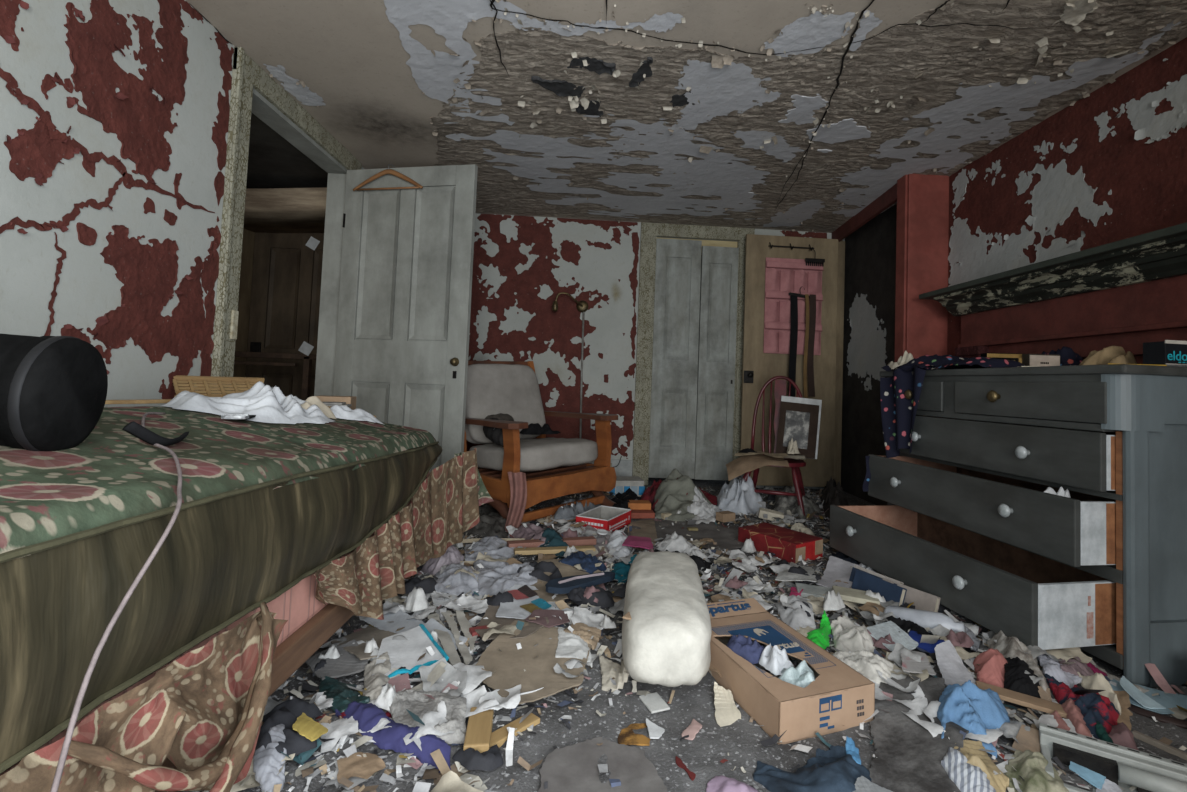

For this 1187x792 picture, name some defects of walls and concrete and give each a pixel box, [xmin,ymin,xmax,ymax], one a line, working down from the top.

peeling [0,0,234,399]
peeling [263,64,326,107]
crack [490,0,1043,211]
peeling [384,0,1187,459]